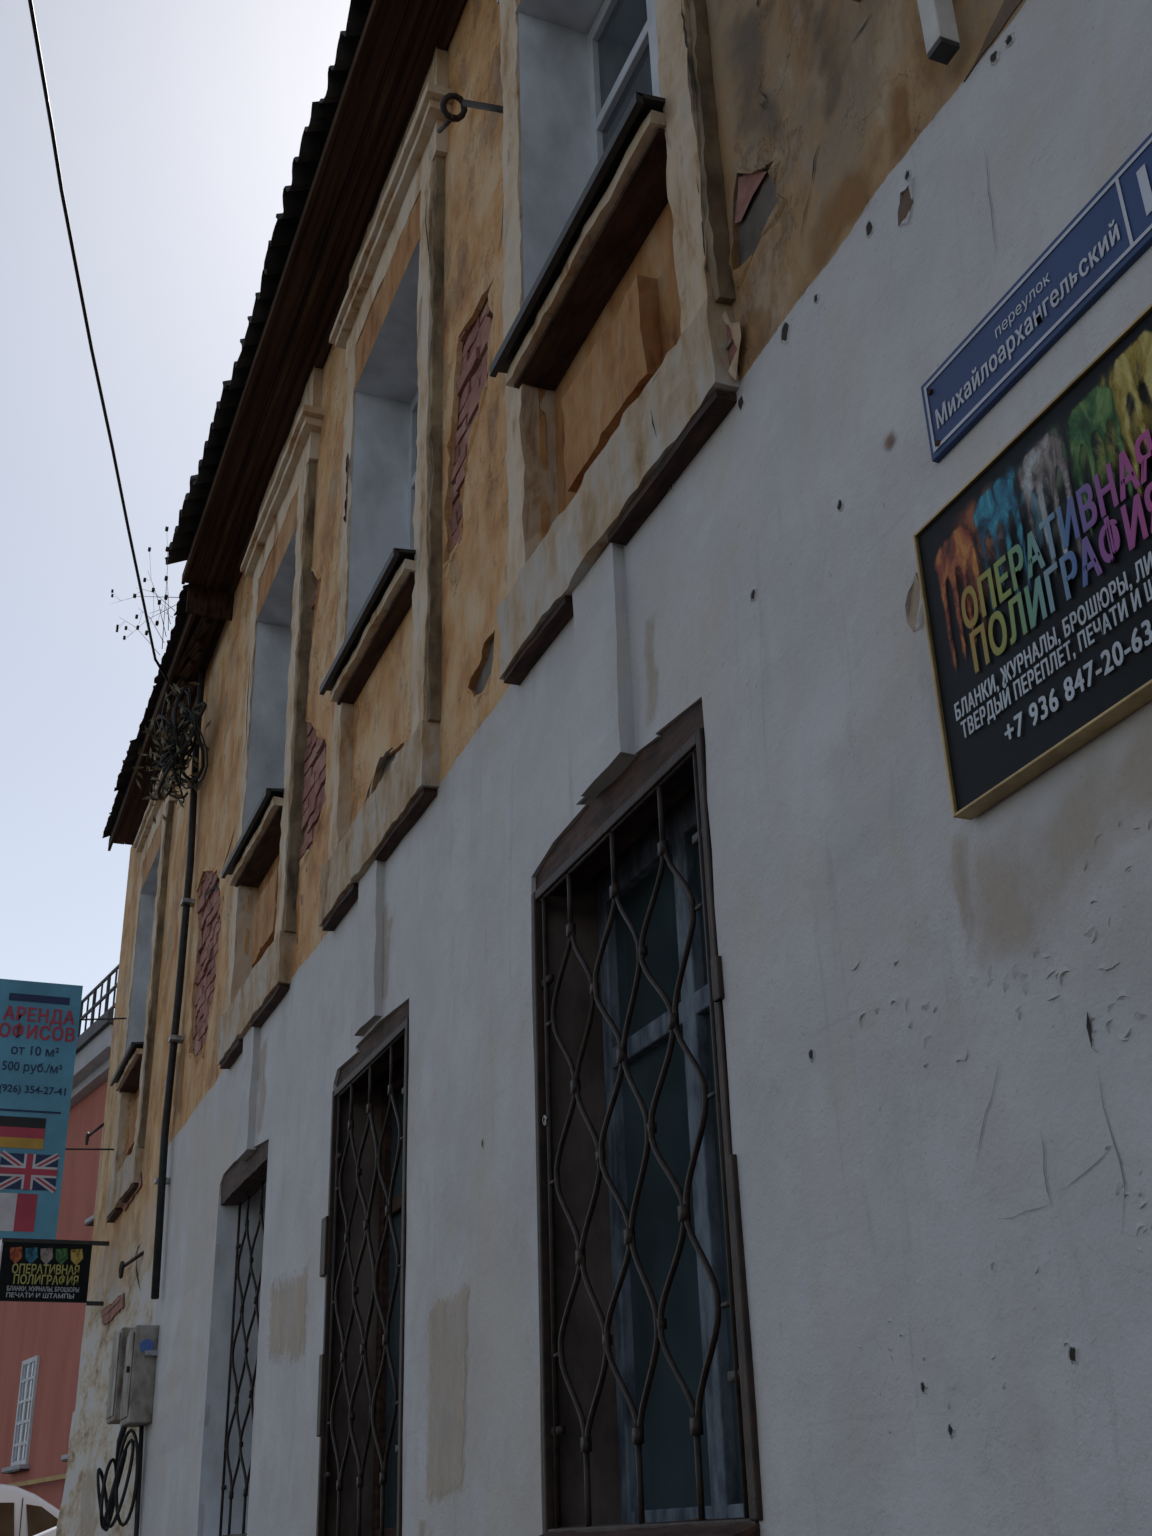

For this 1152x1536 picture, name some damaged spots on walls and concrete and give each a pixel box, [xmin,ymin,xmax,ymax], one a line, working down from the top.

peeling [963,0,1023,82]
flaking render [729,153,788,289]
flaking render [443,276,495,573]
flaking render [295,567,330,945]
flaking render [188,864,229,1064]
crack [1002,1012,1125,1226]